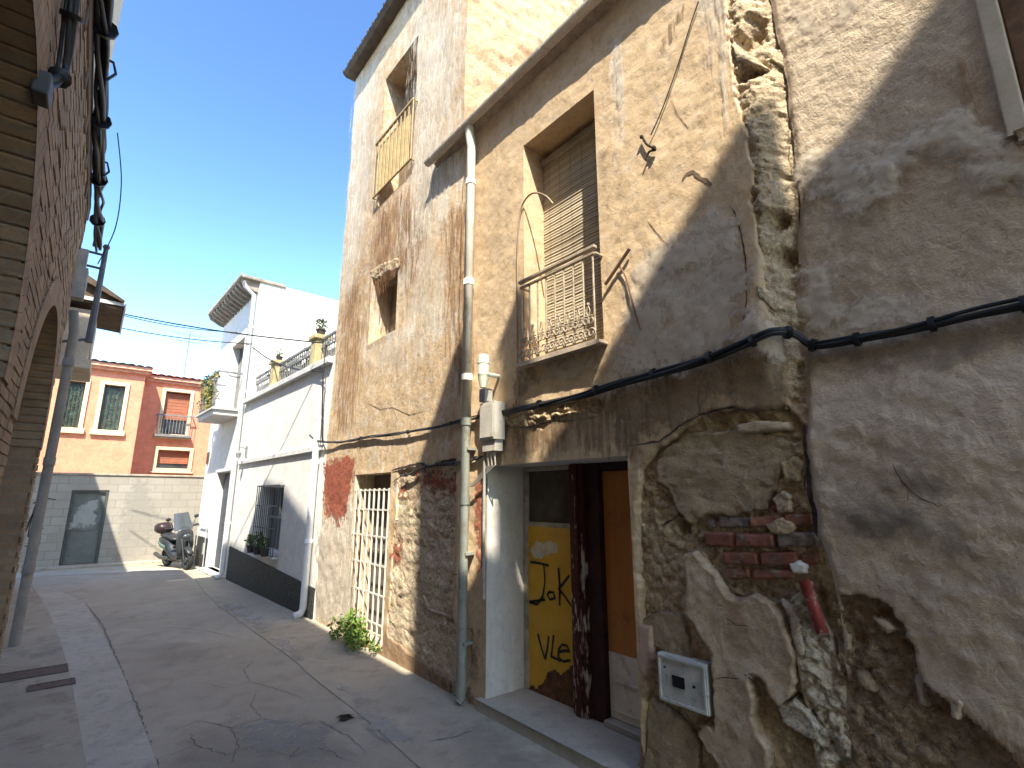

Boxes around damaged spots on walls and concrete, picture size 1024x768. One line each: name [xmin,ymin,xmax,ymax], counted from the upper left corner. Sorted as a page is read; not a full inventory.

crack [86,604,364,768]
water stain [334,0,474,436]
flaking render [388,461,472,696]
flaking render [637,0,1020,768]